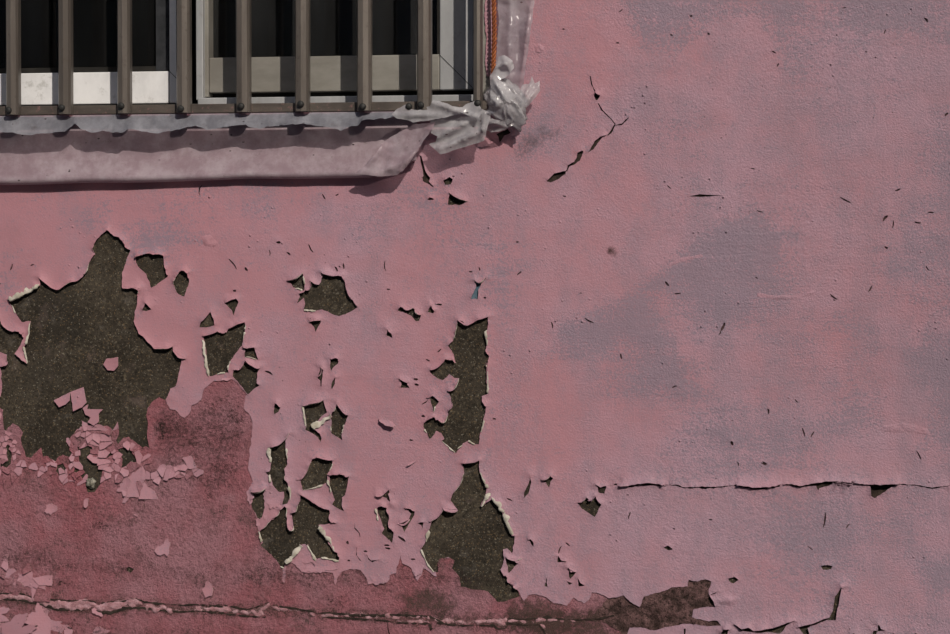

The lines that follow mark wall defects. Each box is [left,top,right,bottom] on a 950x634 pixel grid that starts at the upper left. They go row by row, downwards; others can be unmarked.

crack [547,76,629,182]
peeling [0,231,622,634]
crack [614,481,950,498]
crack [0,592,614,634]